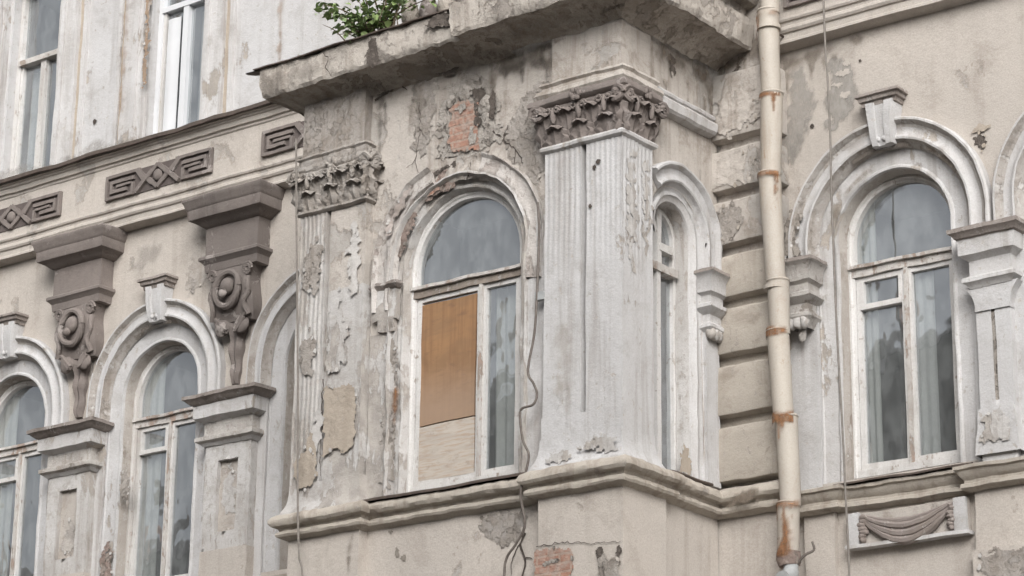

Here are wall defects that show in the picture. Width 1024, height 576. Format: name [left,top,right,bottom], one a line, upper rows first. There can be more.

spalling [410,67,550,202]
spalling [970,123,991,152]
peeling [623,148,654,274]
rust [766,326,785,337]
peeling [293,221,361,492]
peeling [376,334,401,489]
rust [772,411,794,437]
peeling [478,509,528,549]
rust [776,502,798,556]
flaking render [533,546,574,576]
spalling [595,545,622,576]
peeling [977,546,1024,576]